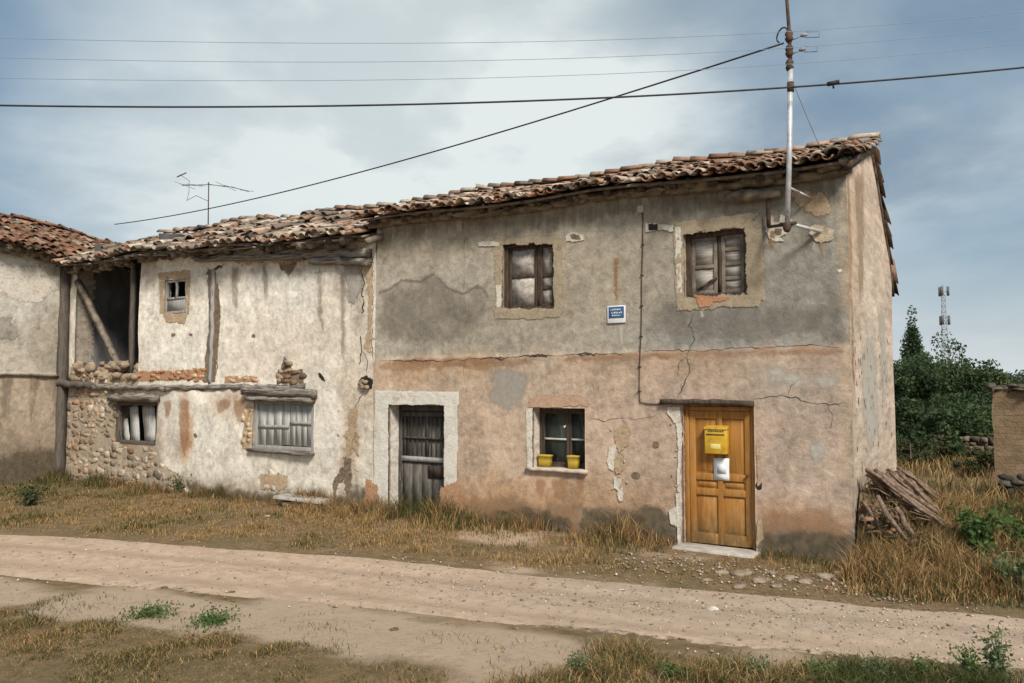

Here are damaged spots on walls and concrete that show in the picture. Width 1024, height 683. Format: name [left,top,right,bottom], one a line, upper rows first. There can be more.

spalling [764,215,794,242]
spalling [791,188,834,250]
crack [355,244,842,407]
spalling [694,294,730,317]
crack [758,379,845,425]
spalling [259,469,288,491]
flaking render [332,407,380,506]
flaking render [606,423,640,502]
flaking render [667,407,683,544]